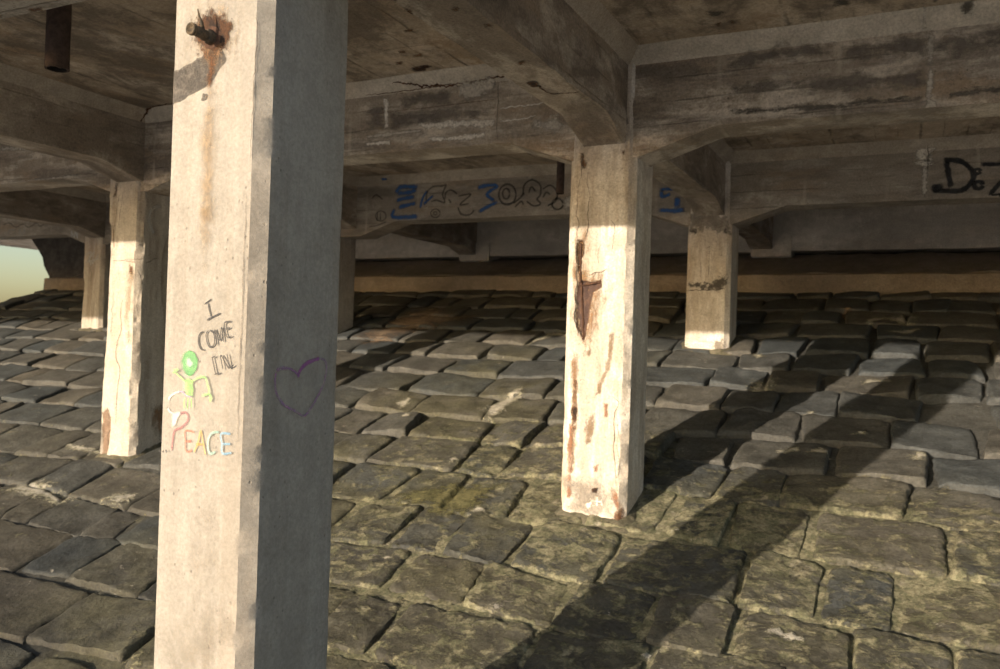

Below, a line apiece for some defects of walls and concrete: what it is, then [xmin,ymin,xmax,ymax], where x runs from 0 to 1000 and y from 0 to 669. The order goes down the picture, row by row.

corrosion [194,7,237,86]
crack [366,61,577,139]
leakage [730,28,1000,114]
corrosion [152,405,163,440]
corrosion [567,334,614,497]
corrosion [611,490,624,520]